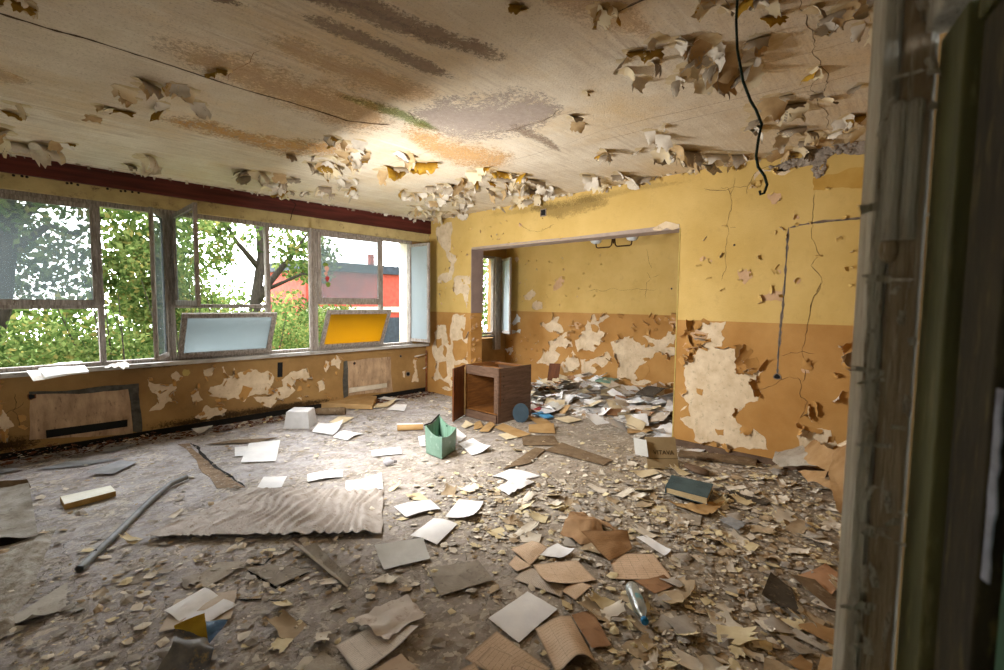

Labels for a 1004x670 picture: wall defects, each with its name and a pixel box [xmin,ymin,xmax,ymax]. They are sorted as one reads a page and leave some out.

peeling [0,0,38,19]
damp [303,0,505,77]
peeling [82,77,212,124]
damp [409,86,563,151]
peeling [566,114,585,133]
peeling [109,153,172,181]
peeling [185,135,679,391]
peeling [505,257,781,452]
peeling [579,0,941,670]
crack [766,197,822,417]
peeling [148,369,190,411]
peeling [191,355,356,420]